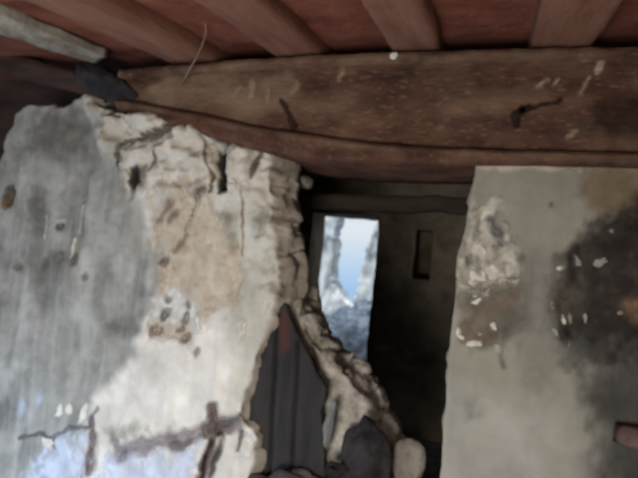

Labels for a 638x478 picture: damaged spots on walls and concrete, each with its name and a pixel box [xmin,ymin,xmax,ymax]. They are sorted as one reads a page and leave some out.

spalling [123,166,146,195]
crack [114,124,174,171]
crack [185,135,216,231]
spalling [206,144,237,193]
flaking render [143,182,245,343]
spalling [456,196,532,353]
crack [18,401,98,477]
crack [111,403,243,478]